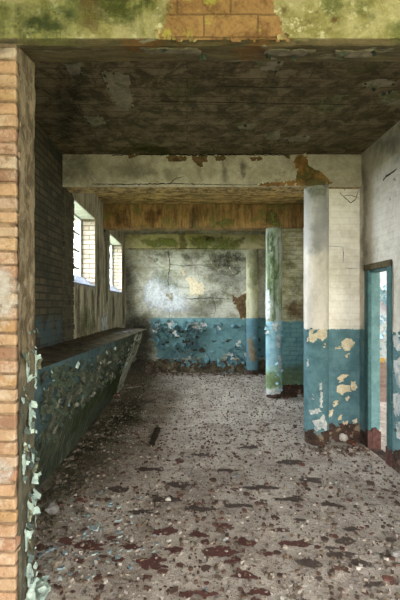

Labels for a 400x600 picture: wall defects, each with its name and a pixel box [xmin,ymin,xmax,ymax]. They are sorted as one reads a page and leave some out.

flaking render [334,49,377,60]
flaking render [101,71,134,111]
crack [128,248,229,315]
flaking render [180,268,206,297]
peeling [145,289,304,397]
peeling [306,328,327,348]
peeling [335,338,355,358]
flaking render [305,374,360,446]
peeling [21,332,143,600]